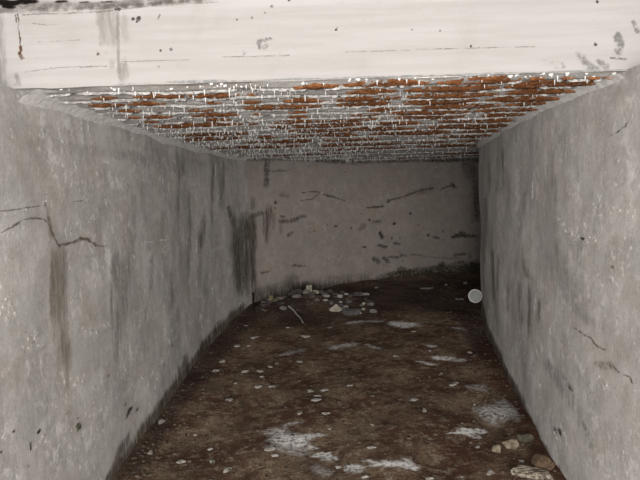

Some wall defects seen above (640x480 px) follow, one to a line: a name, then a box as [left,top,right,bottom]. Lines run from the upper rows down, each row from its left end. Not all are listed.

leakage [44,61,604,184]
crack [2,204,105,247]